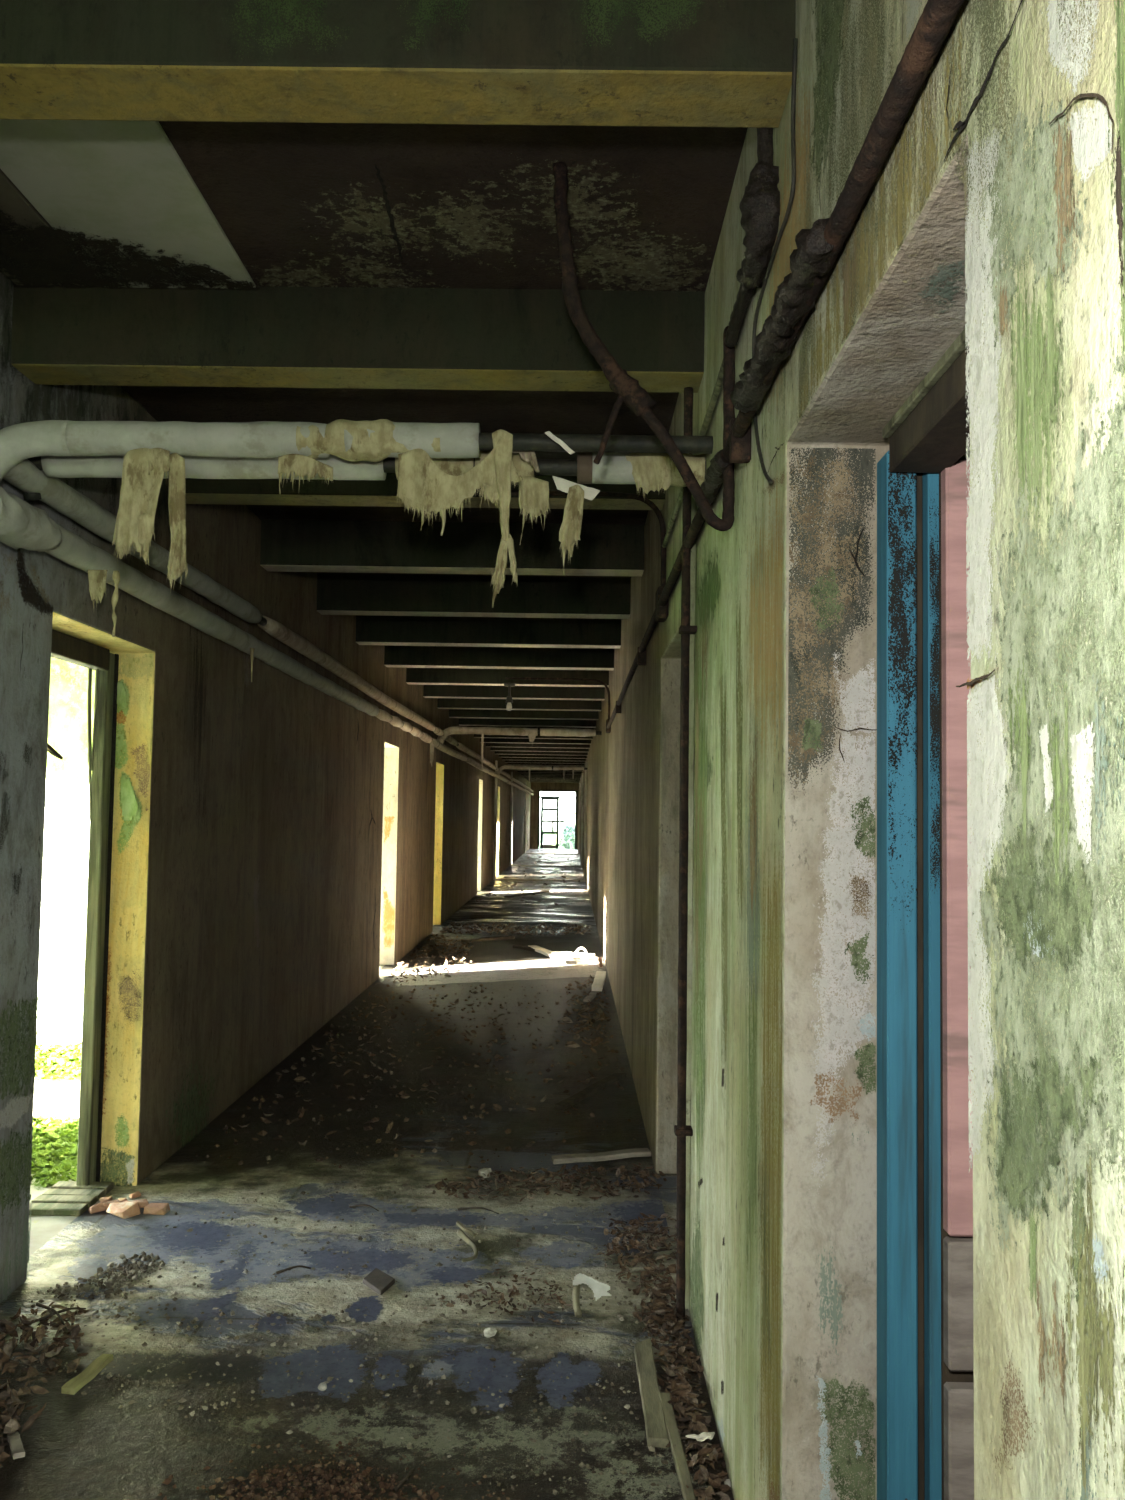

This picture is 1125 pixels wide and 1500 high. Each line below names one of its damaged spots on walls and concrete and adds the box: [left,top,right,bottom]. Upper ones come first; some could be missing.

crack [944,0,1023,161]
damp [694,586,709,1040]
damp [745,0,1125,1500]
damp [0,1094,32,1130]
damp [207,1391,713,1500]